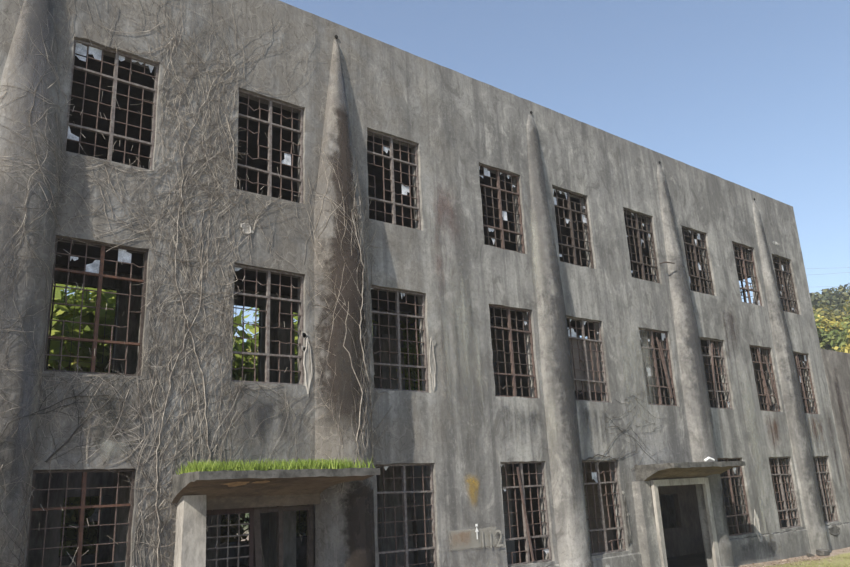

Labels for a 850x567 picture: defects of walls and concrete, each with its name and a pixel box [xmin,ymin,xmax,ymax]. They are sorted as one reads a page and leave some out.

damp [27,0,53,112]
damp [318,69,366,411]
damp [537,142,550,218]
damp [543,244,582,473]